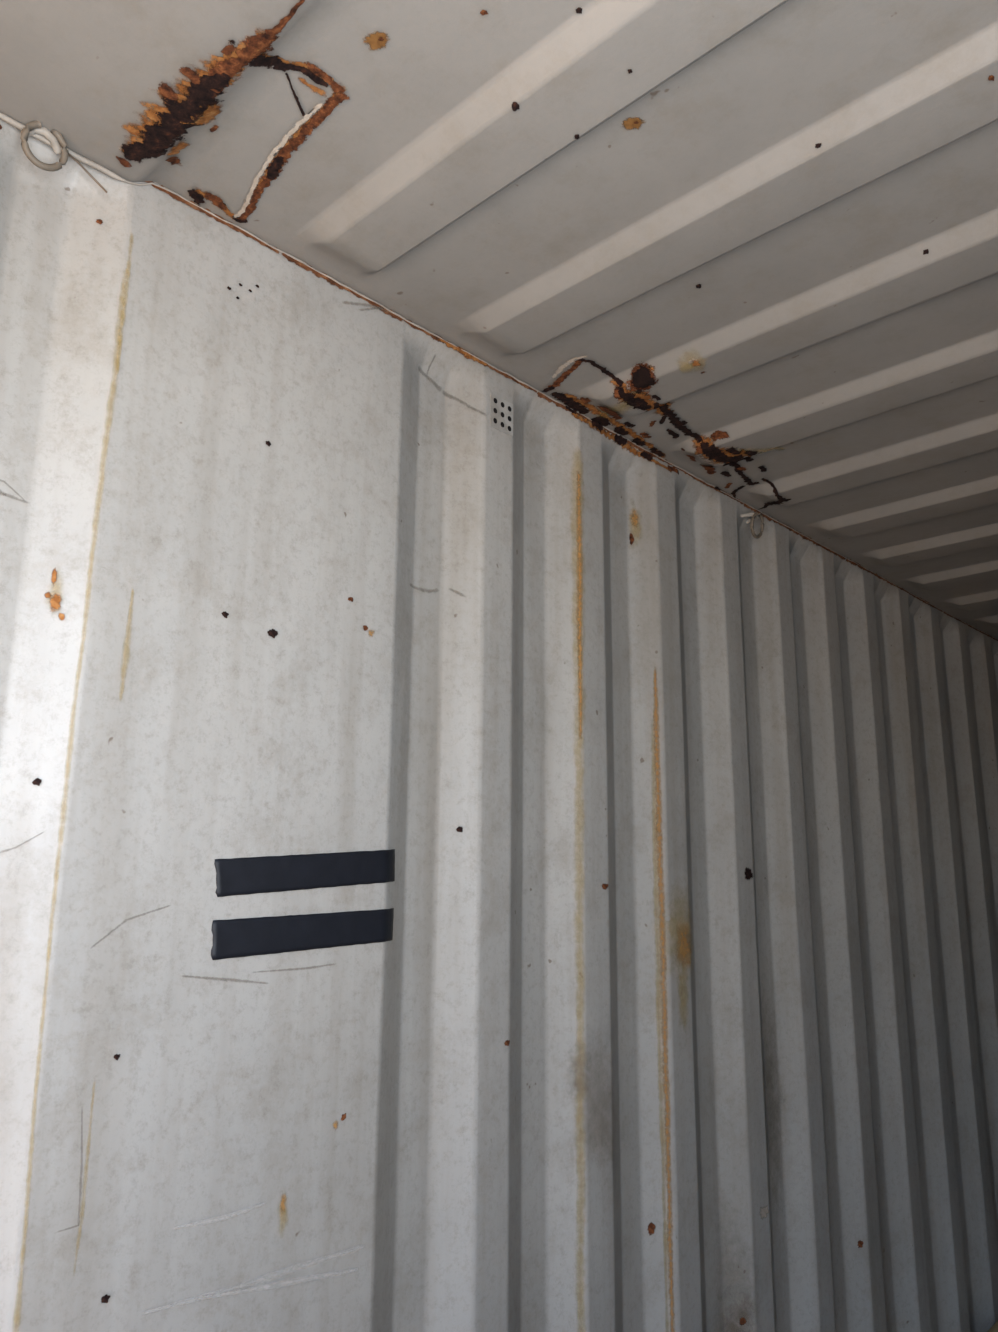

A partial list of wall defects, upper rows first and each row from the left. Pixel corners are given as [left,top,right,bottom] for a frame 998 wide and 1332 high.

corrosion [116,0,305,167]
corrosion [364,31,388,50]
corrosion [623,117,644,130]
corrosion [144,181,998,641]
corrosion [45,569,65,620]
corrosion [654,670,691,1332]